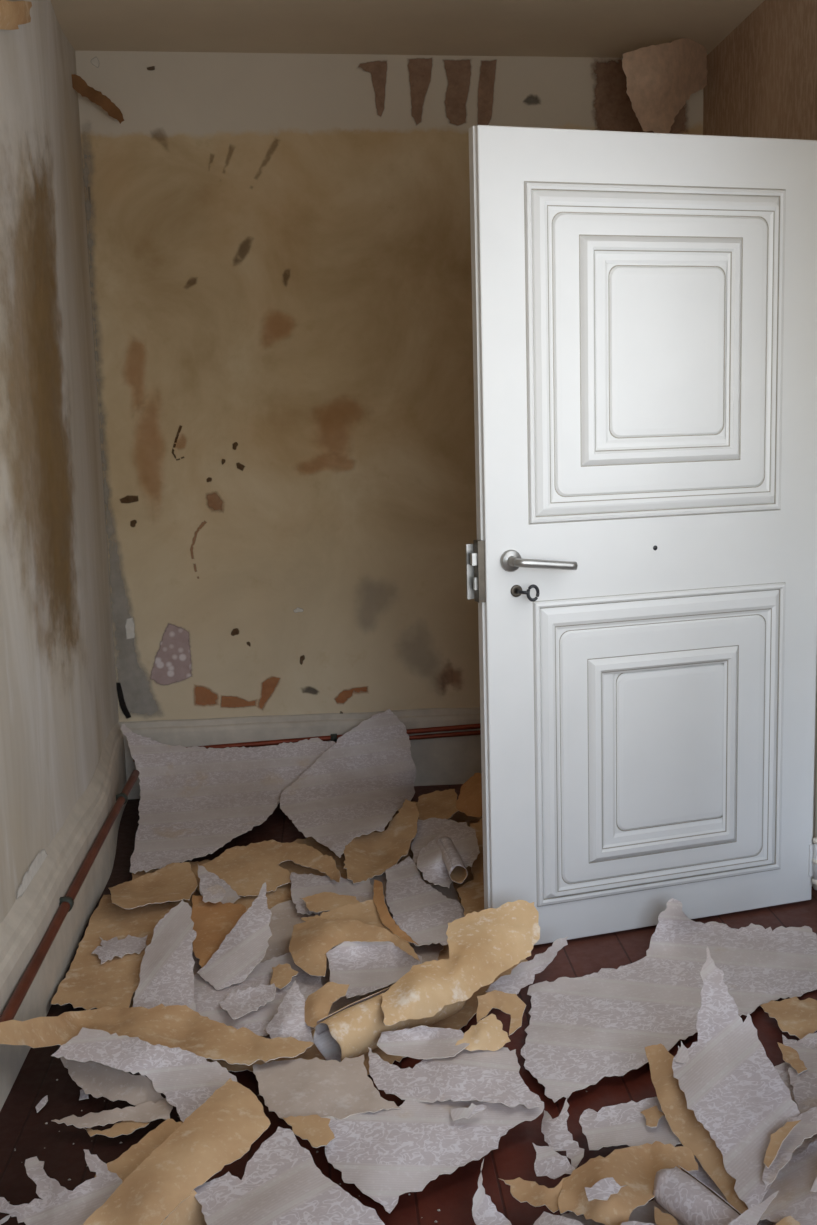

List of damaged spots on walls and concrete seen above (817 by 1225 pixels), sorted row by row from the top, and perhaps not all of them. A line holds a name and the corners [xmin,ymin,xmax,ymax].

peeling [358,61,387,116]
peeling [408,58,471,126]